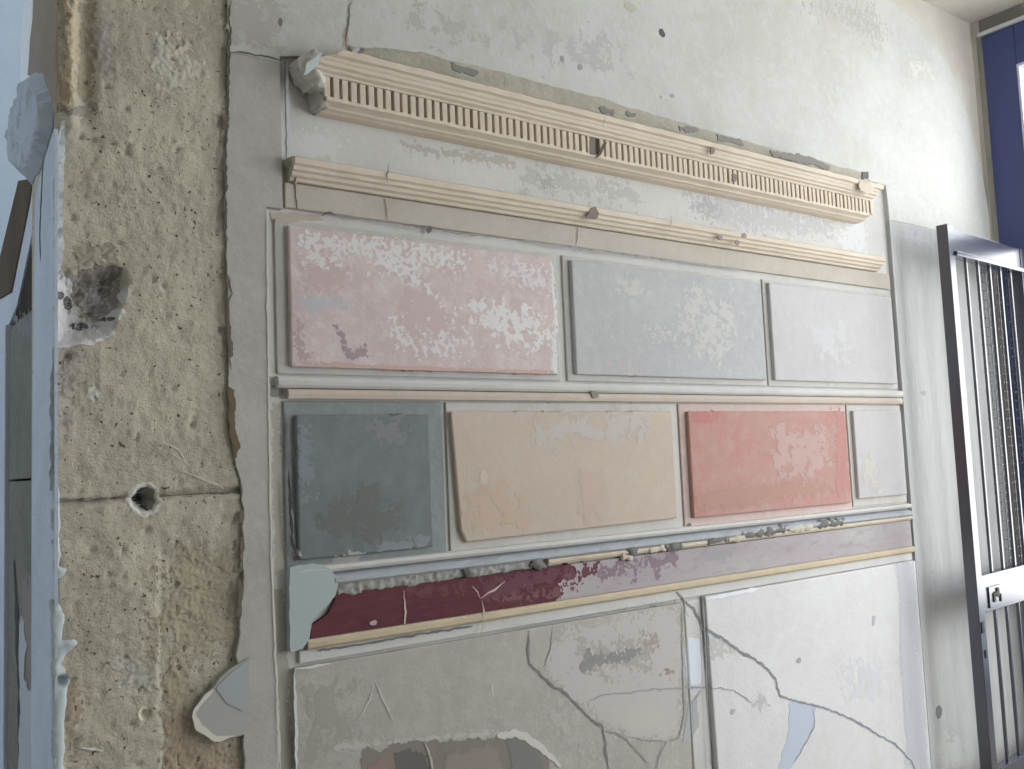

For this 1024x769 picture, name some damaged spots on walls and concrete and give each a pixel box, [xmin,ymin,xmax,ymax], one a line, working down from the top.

spalling [58,265,123,330]
peeling [297,221,558,375]
peeling [766,416,836,486]
spalling [125,482,163,518]
spalling [336,559,547,597]
peeling [492,573,584,605]
spalling [620,542,683,561]
crack [317,581,505,651]
crack [511,592,915,769]
spalling [192,689,234,742]
spalling [360,729,561,769]